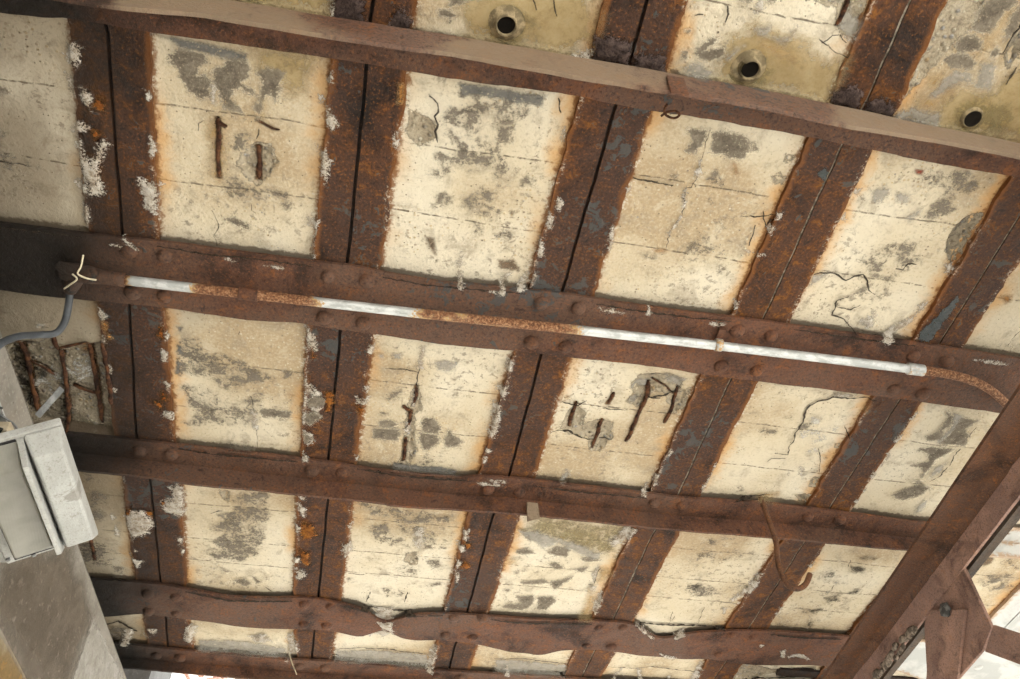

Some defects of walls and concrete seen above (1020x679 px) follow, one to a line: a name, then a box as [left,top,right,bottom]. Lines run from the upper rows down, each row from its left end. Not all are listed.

spalling [904,0,1020,99]
peeling [167,38,286,178]
crack [429,95,439,143]
water stain [897,63,1020,138]
water stain [138,177,166,216]
spalling [236,142,279,186]
crack [793,272,915,347]
spalling [7,337,113,434]
spalling [560,401,613,451]
spalling [624,373,691,442]
crack [768,396,877,461]